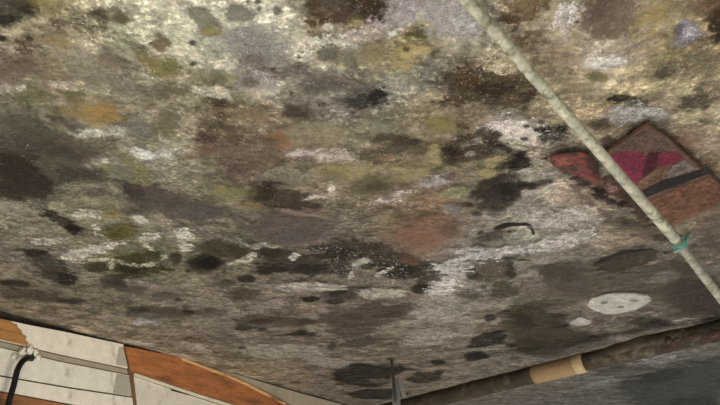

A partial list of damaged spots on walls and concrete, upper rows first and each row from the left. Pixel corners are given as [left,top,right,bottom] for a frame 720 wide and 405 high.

leakage [497,0,720,112]
leakage [586,94,668,132]
leakage [0,0,598,351]
leakage [460,218,720,361]
leakage [233,344,446,400]